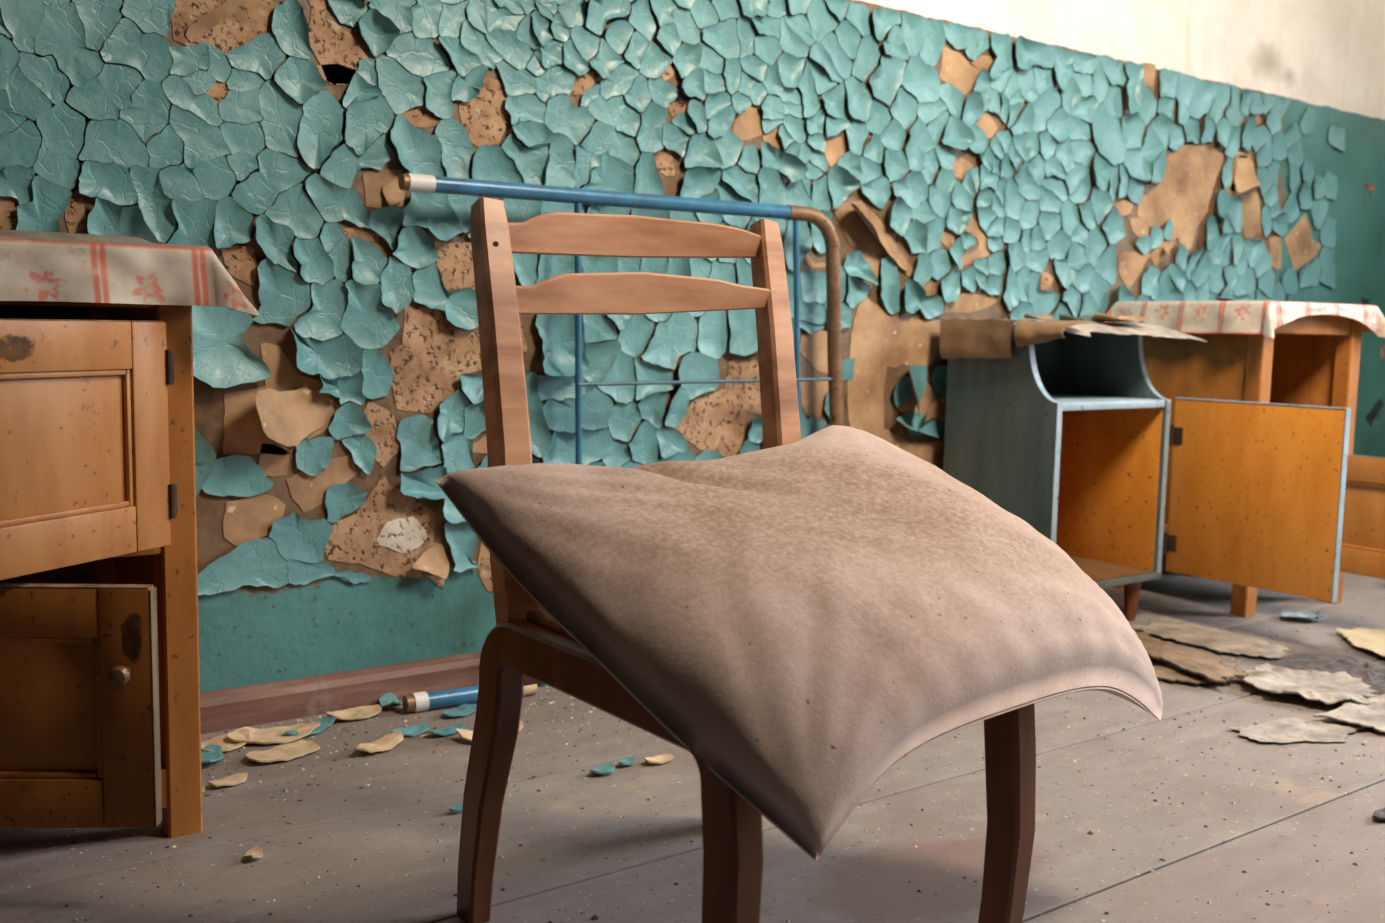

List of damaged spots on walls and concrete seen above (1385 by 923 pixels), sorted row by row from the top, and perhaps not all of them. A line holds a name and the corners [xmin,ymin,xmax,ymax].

crack [0,0,401,349]
crack [194,425,216,496]
peeling [0,0,1091,595]
crack [367,0,949,469]
peeling [1122,61,1179,125]
peeling [1094,92,1336,309]